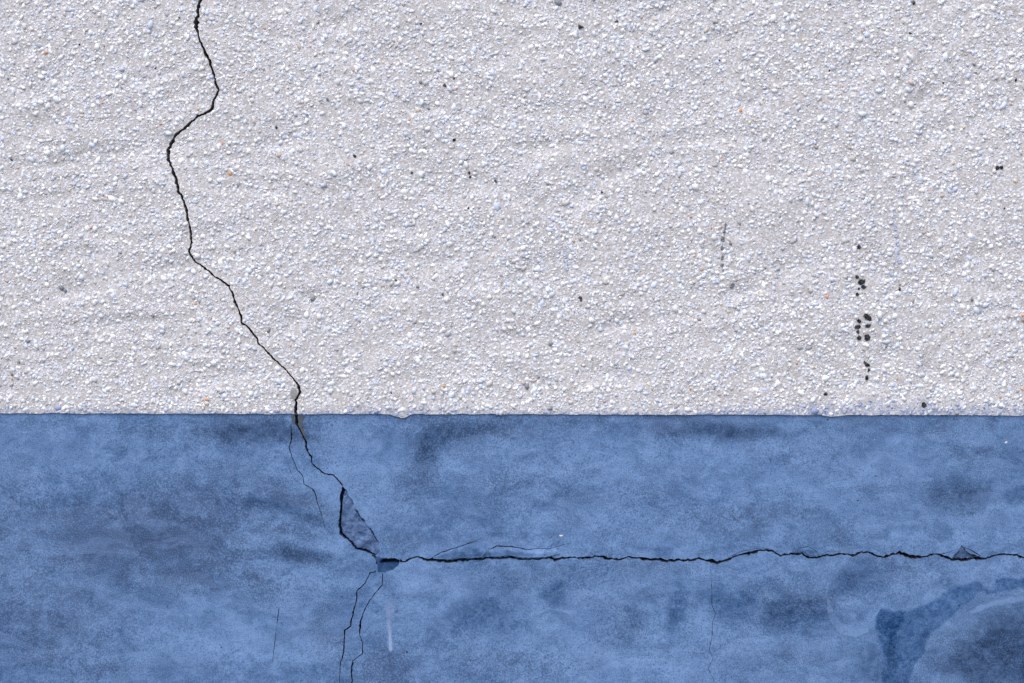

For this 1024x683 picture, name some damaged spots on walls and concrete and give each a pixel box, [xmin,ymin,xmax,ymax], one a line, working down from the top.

crack [166,0,343,535]
spalling [338,486,400,573]
crack [339,540,1024,683]